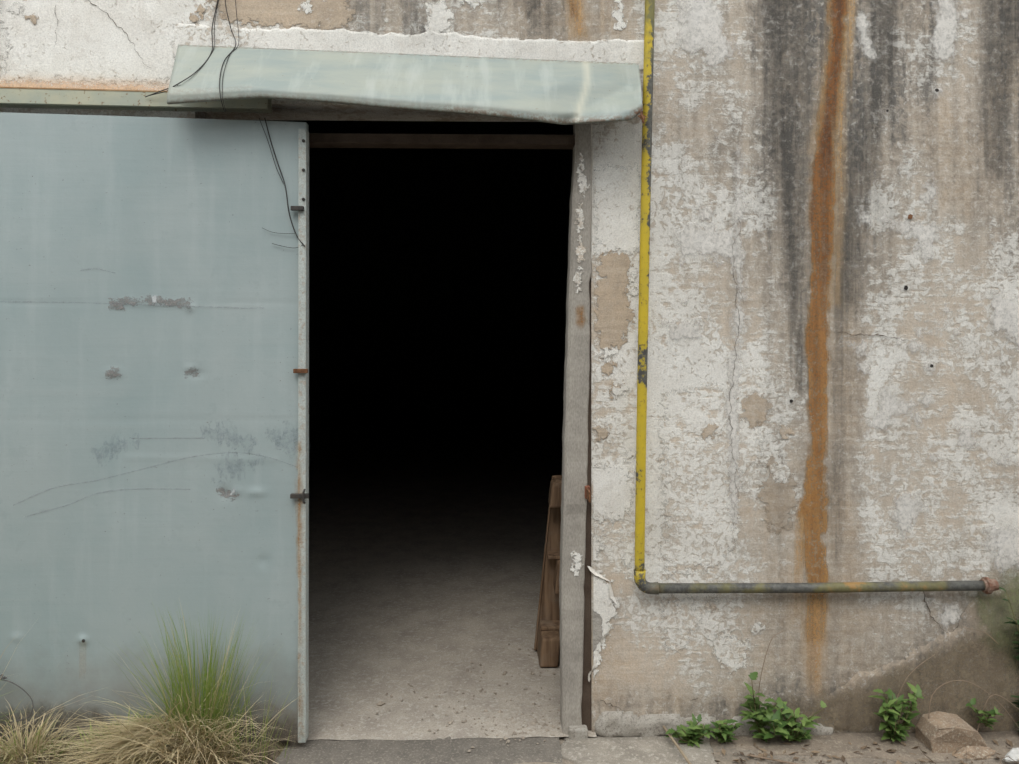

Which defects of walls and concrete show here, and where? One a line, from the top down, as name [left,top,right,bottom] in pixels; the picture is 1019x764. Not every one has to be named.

peeling [421,0,492,33]
peeling [573,153,641,399]
peeling [657,151,800,580]
corrosion [796,0,855,682]
peeling [570,448,636,683]
peeling [658,593,766,675]